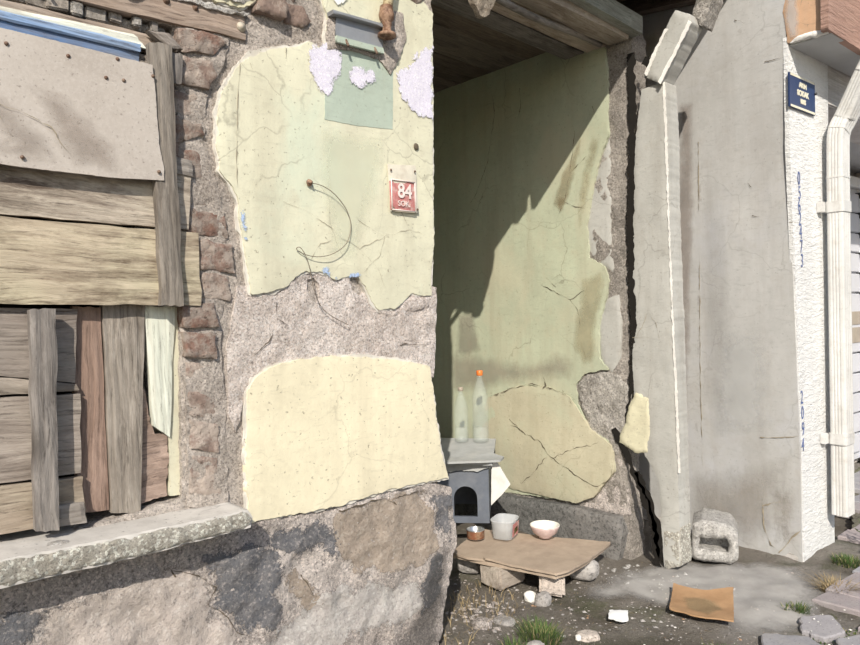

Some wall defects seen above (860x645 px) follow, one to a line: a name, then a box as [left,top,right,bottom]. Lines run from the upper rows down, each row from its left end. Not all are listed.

flaking render [177,0,376,97]
peeling [396,45,434,119]
flaking render [588,139,614,272]
spalling [225,267,437,433]
crack [509,52,662,568]
flaking render [600,295,623,372]
damp [260,558,441,645]